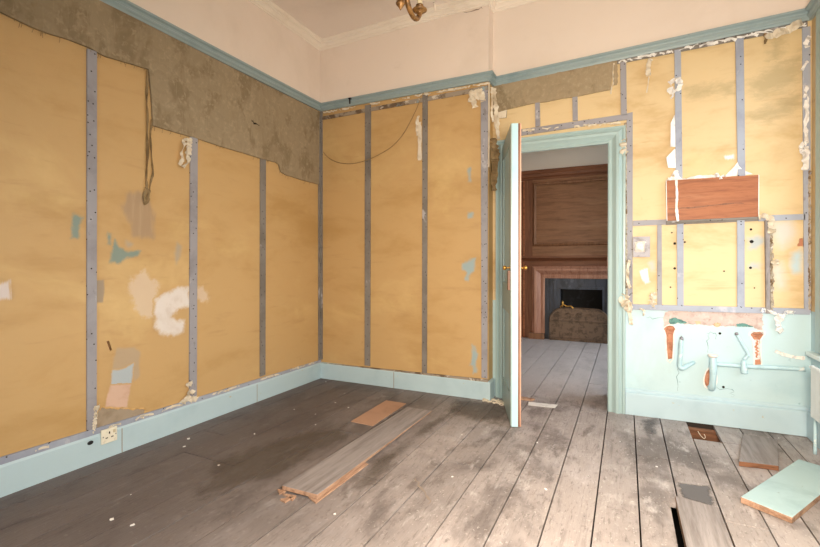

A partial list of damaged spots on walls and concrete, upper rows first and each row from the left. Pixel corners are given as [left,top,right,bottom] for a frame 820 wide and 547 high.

spalling [663,311,764,362]